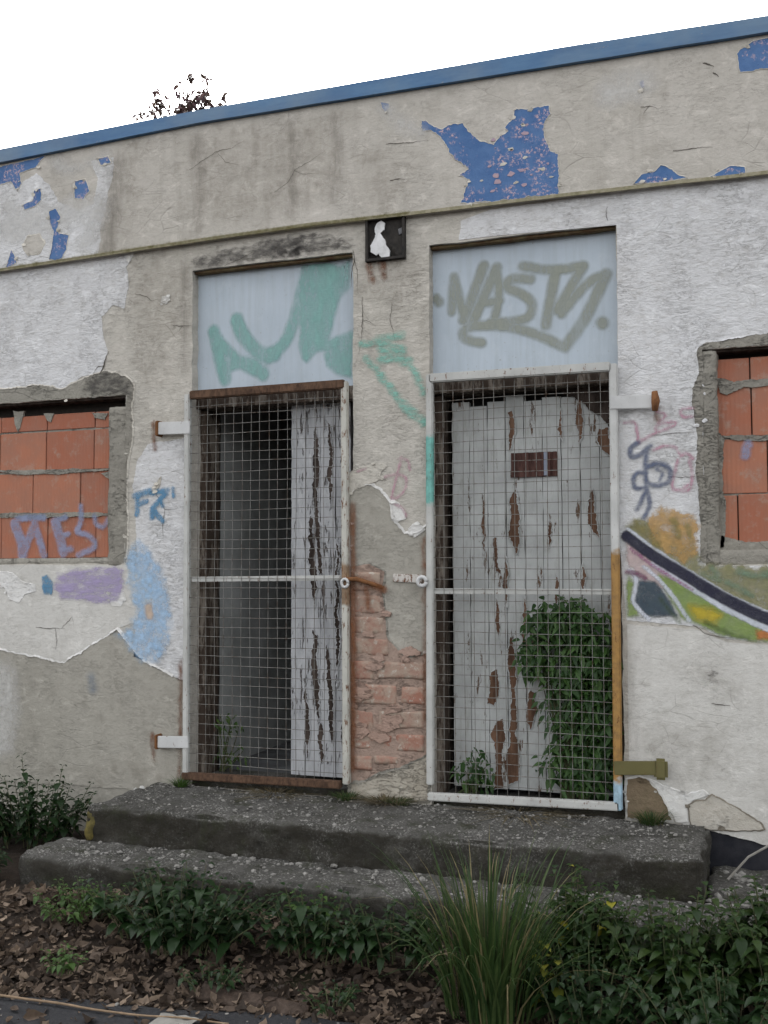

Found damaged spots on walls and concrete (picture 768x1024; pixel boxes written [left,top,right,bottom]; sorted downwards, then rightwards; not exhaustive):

peeling [736,37,768,73]
peeling [0,155,69,267]
peeling [72,179,90,200]
peeling [421,105,562,206]
peeling [633,164,688,185]
peeling [709,165,746,178]
flaking render [0,370,135,565]
flaking render [690,331,768,564]
peeling [0,571,36,603]
flaking render [303,423,432,804]
flaking render [623,775,709,823]